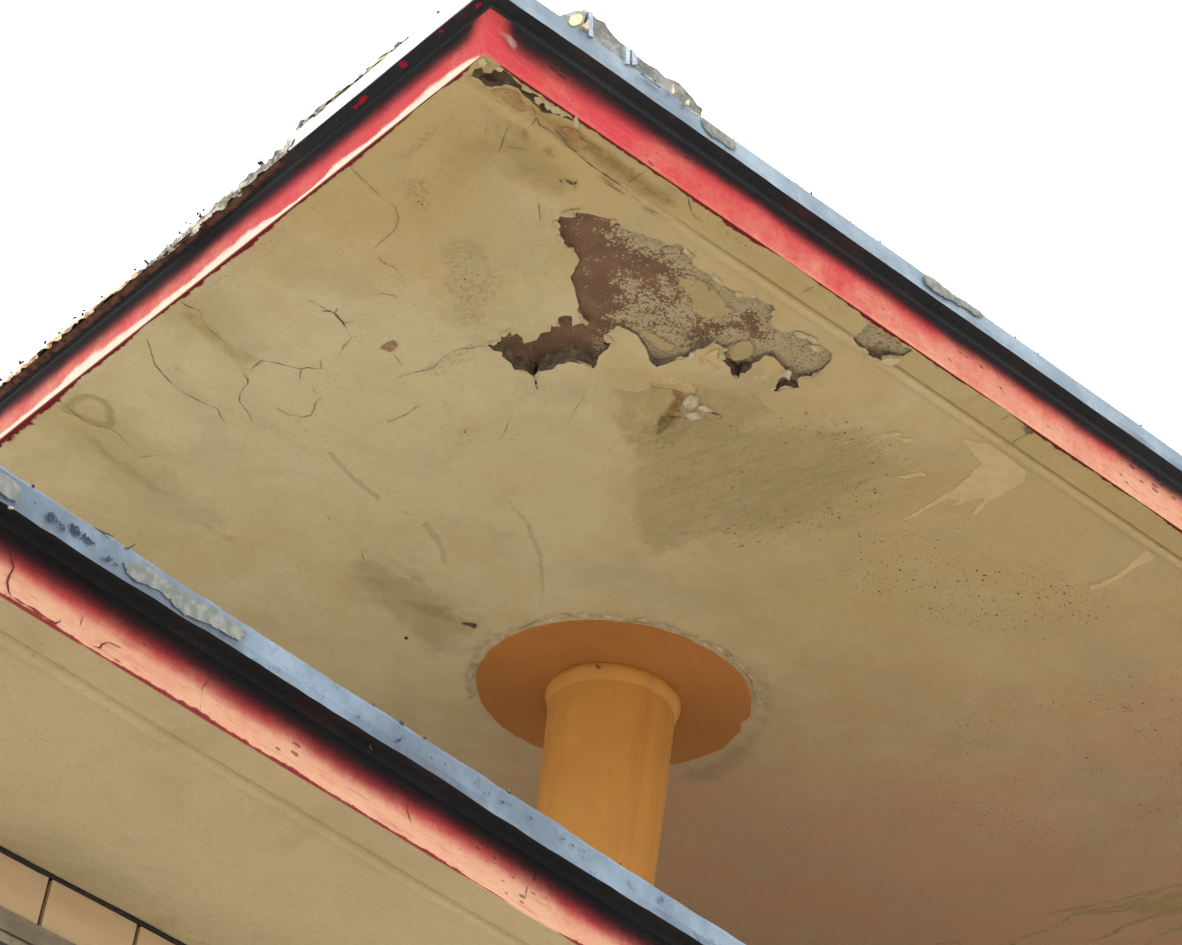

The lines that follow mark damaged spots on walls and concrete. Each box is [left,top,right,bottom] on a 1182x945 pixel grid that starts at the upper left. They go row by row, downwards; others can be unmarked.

spalling [469,58,579,129]
spalling [488,209,833,393]
crack [138,300,357,425]
spalling [853,323,912,366]
flaking render [683,395,713,421]